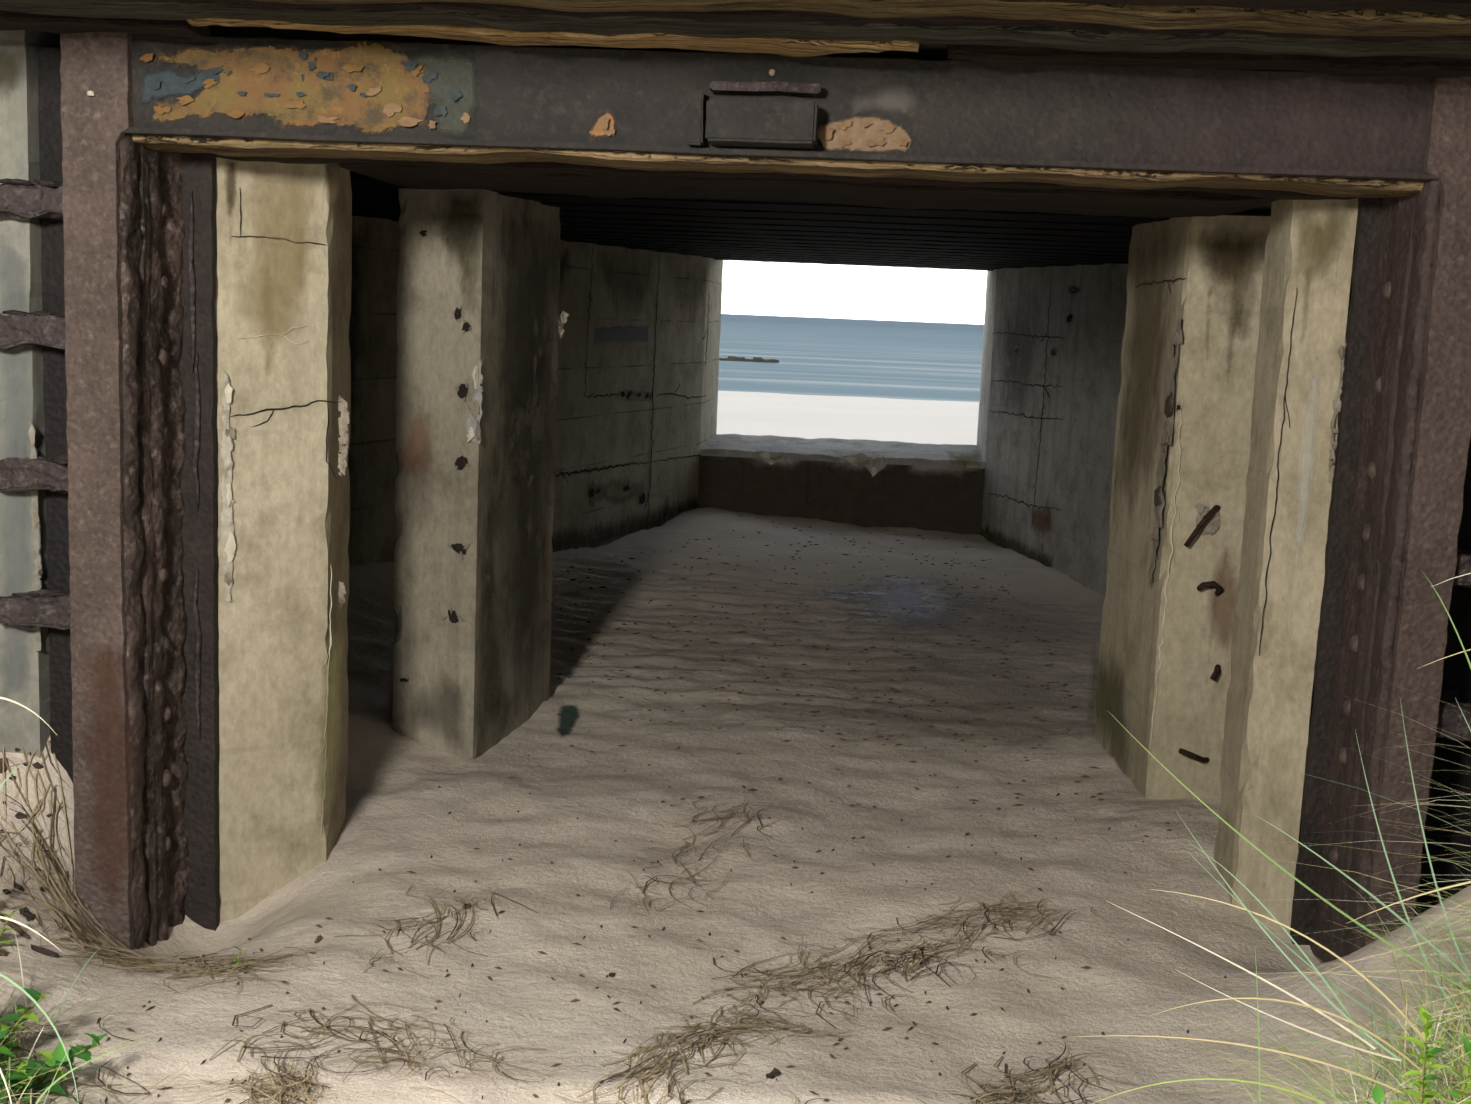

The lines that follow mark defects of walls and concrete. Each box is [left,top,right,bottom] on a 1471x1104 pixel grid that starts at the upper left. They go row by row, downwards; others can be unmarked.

peeling [139,41,476,135]
peeling [590,113,615,136]
peeling [818,117,911,151]
leakage [1207,237,1252,325]
crack [230,400,342,479]